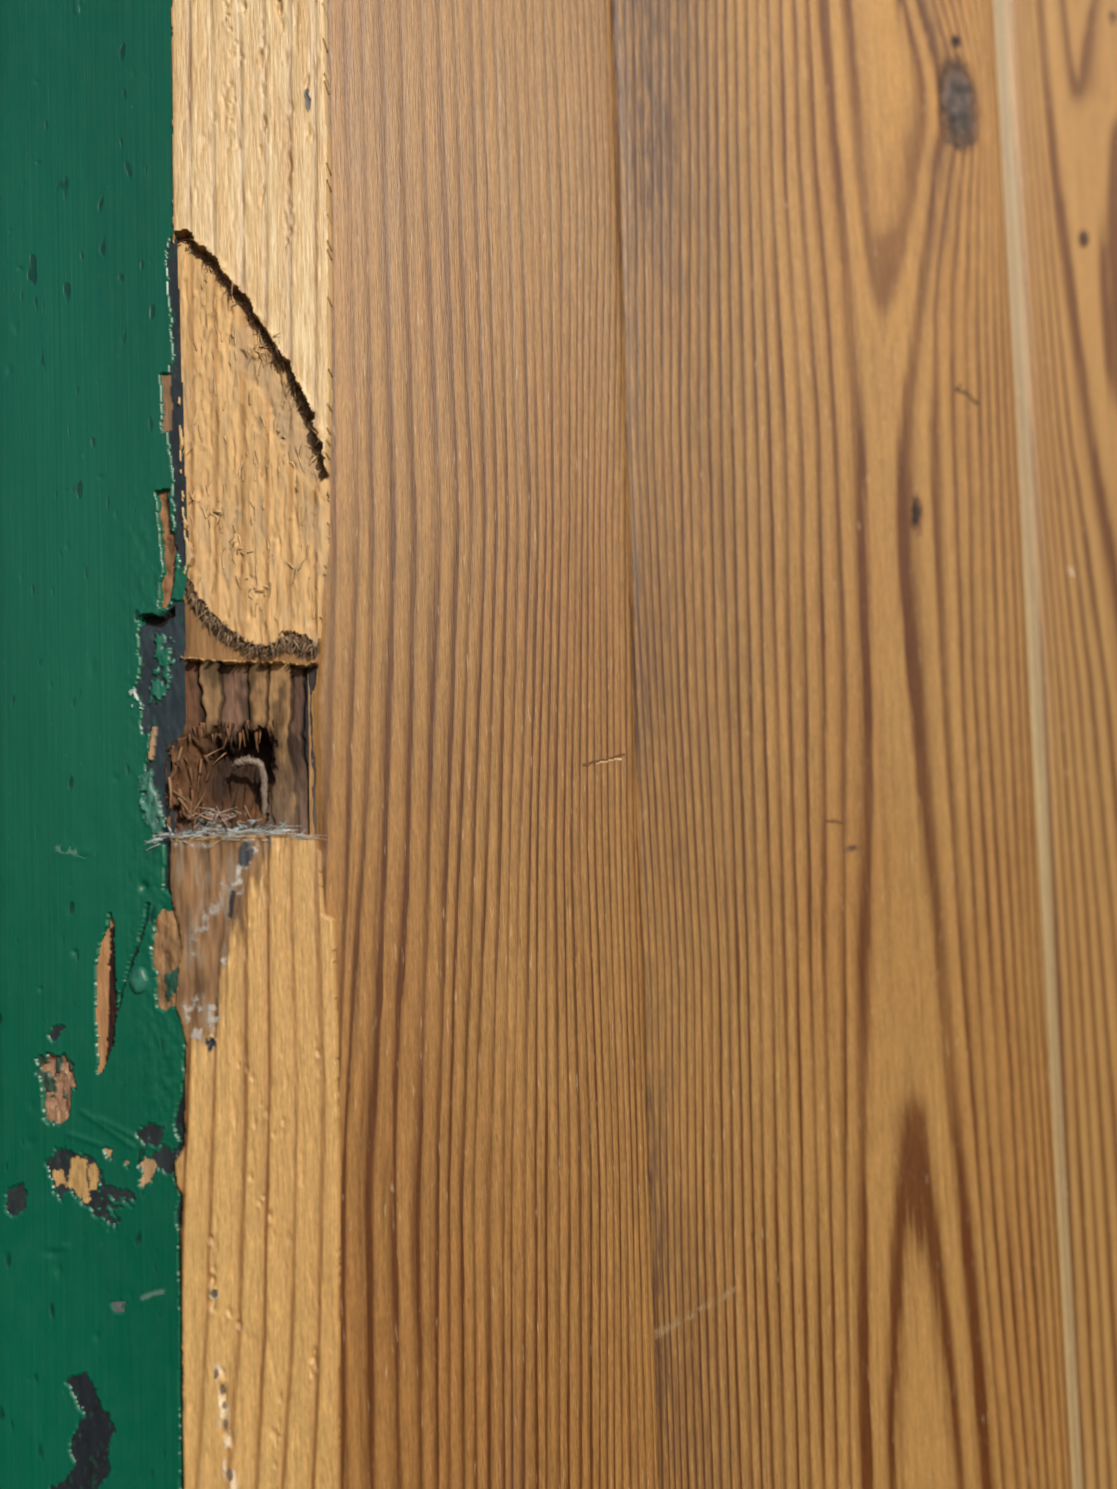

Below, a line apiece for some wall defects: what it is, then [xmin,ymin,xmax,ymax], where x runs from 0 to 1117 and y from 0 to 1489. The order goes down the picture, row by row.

spalling [129,229,330,1011]
spalling [95,918,117,1074]
peeling [37,1025,76,1124]
peeling [46,1058,186,1226]
peeling [111,1302,126,1312]
peeling [50,1373,115,1489]